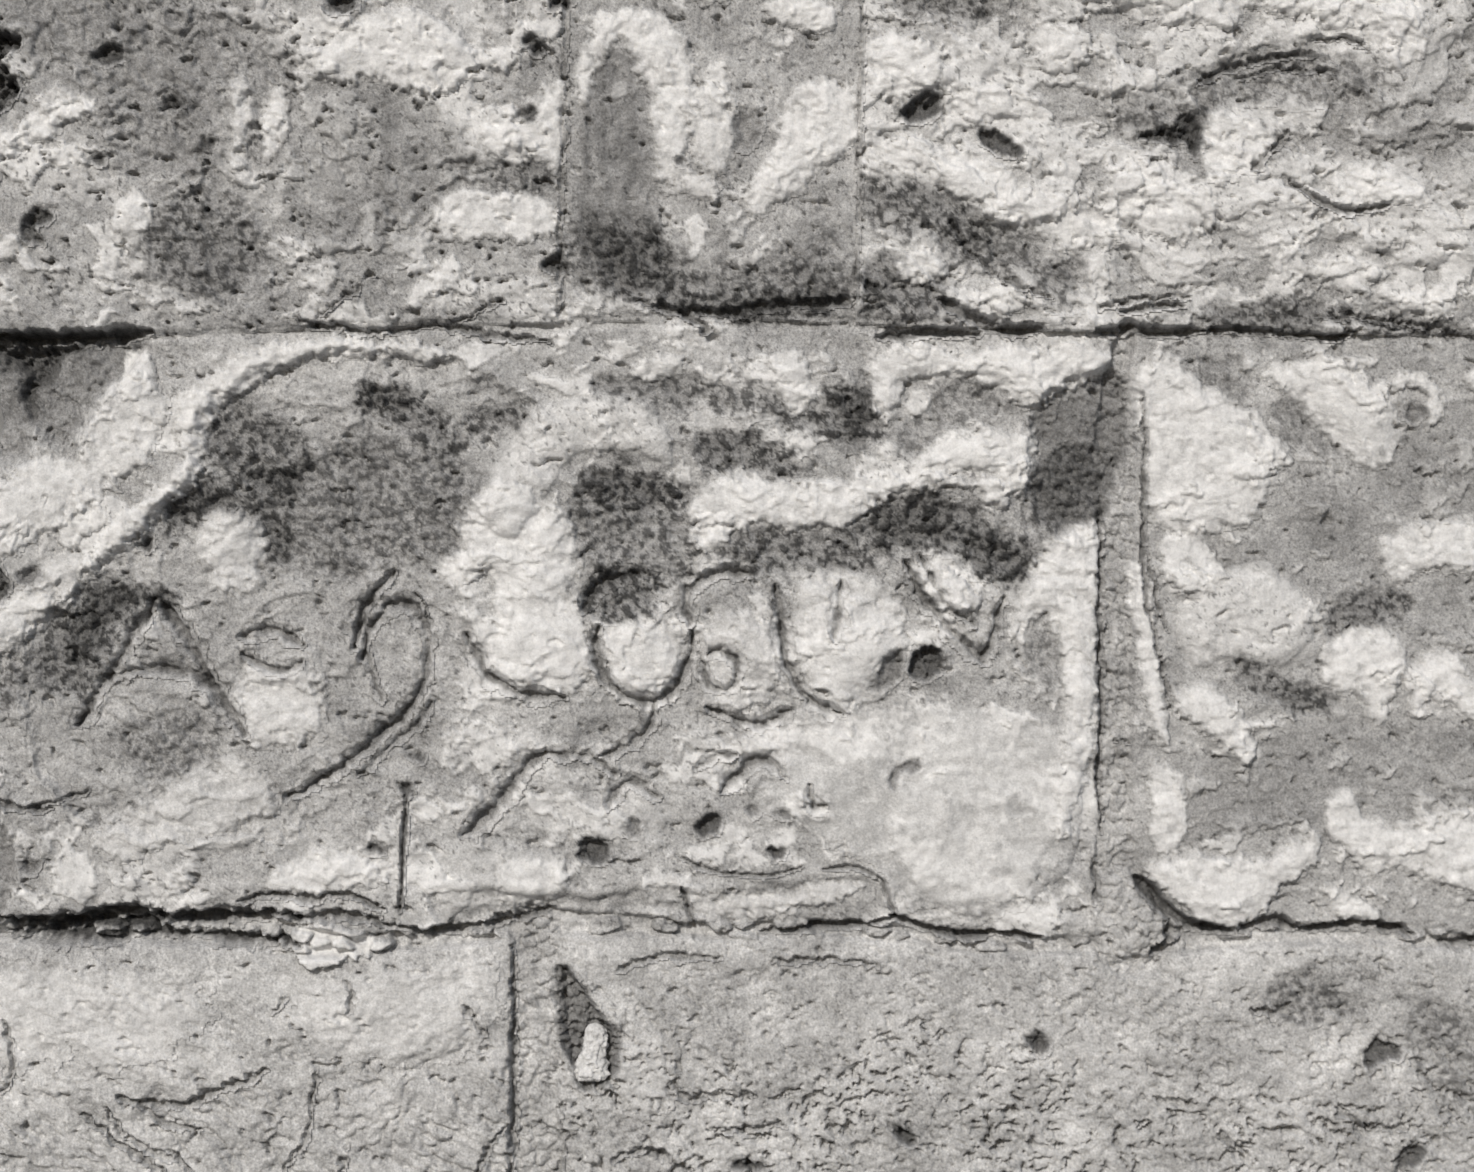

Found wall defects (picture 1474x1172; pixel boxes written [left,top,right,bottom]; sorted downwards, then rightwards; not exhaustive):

peeling [0,25,102,182]
spalling [16,204,56,249]
peeling [108,186,155,238]
spalling [550,962,682,1122]